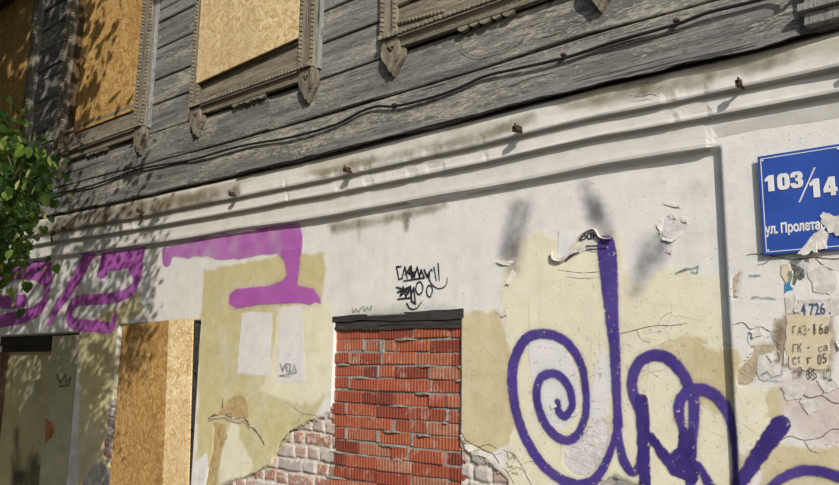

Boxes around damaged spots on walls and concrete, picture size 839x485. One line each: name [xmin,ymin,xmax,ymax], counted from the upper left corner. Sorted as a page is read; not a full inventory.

peeling [737,328,778,386]
spalling [82,397,116,485]
spalling [206,396,336,485]
spalling [460,434,508,485]